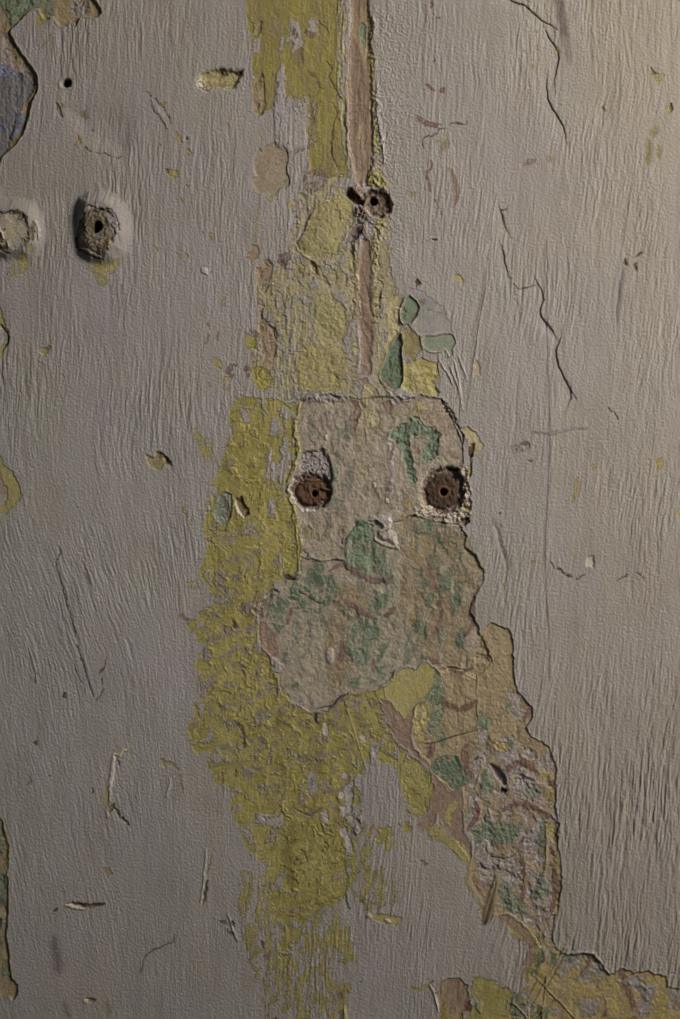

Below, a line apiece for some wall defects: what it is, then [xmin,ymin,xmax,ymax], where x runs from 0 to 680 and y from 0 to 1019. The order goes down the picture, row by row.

peeling [0,0,102,166]
crack [510,0,566,138]
peeling [0,307,10,356]
crack [500,206,573,402]
peeling [0,456,23,515]
peeling [178,0,680,1019]
peeling [0,819,18,1001]